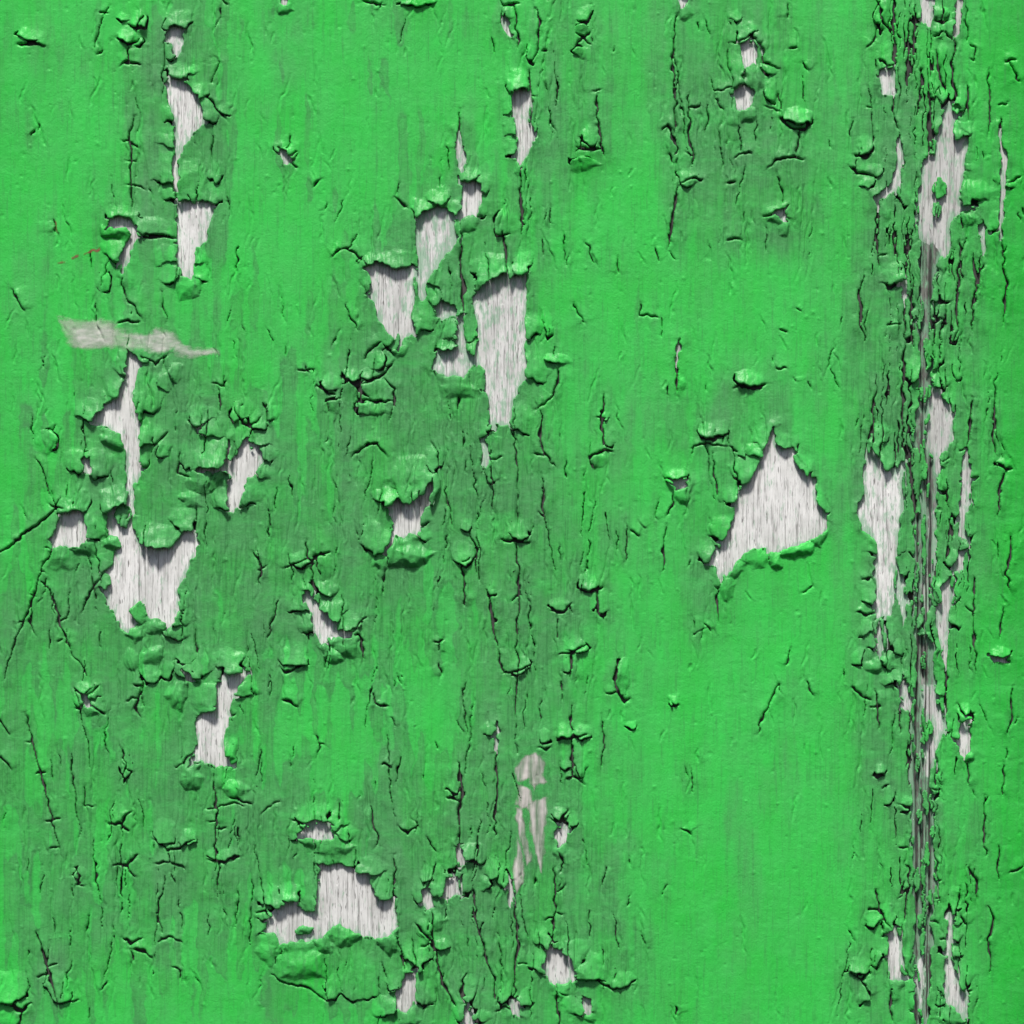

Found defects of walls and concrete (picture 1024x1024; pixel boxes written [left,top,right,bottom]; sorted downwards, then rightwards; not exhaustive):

peeling [93,7,238,330]
peeling [340,0,575,524]
crack [651,7,707,268]
crack [965,41,1024,110]
crack [0,502,95,687]
crack [0,709,188,994]
peeling [31,342,282,903]
peeling [251,719,637,1024]
peeling [687,421,831,628]
crack [753,643,818,740]
peeling [843,0,1024,1024]
crack [848,682,1024,980]